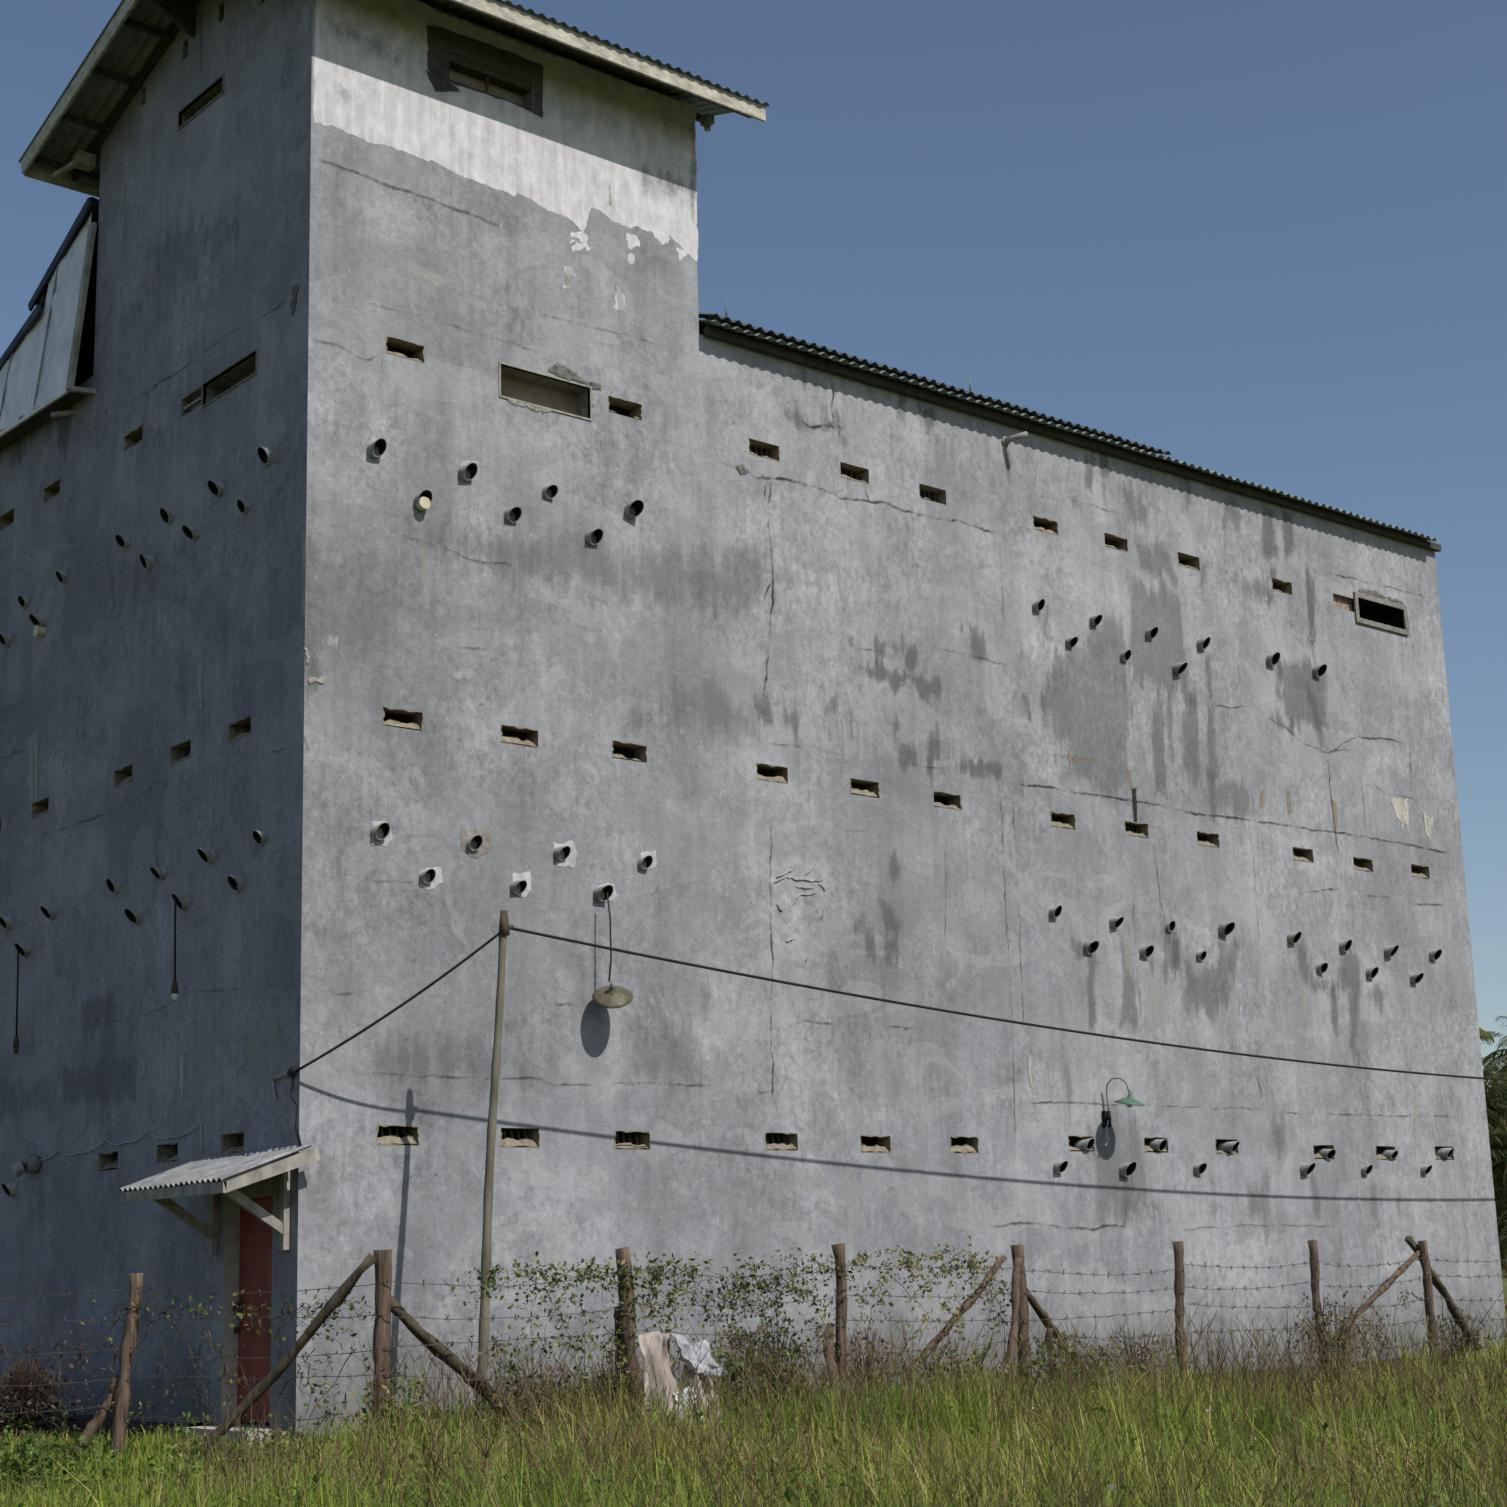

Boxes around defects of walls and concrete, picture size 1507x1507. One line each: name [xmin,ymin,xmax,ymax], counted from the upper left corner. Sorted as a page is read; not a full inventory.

peeling [313,0,698,289]
crack [840,492,993,532]
damp [1263,511,1292,577]
crack [758,476,806,683]
damp [1306,575,1314,627]
damp [868,638,941,696]